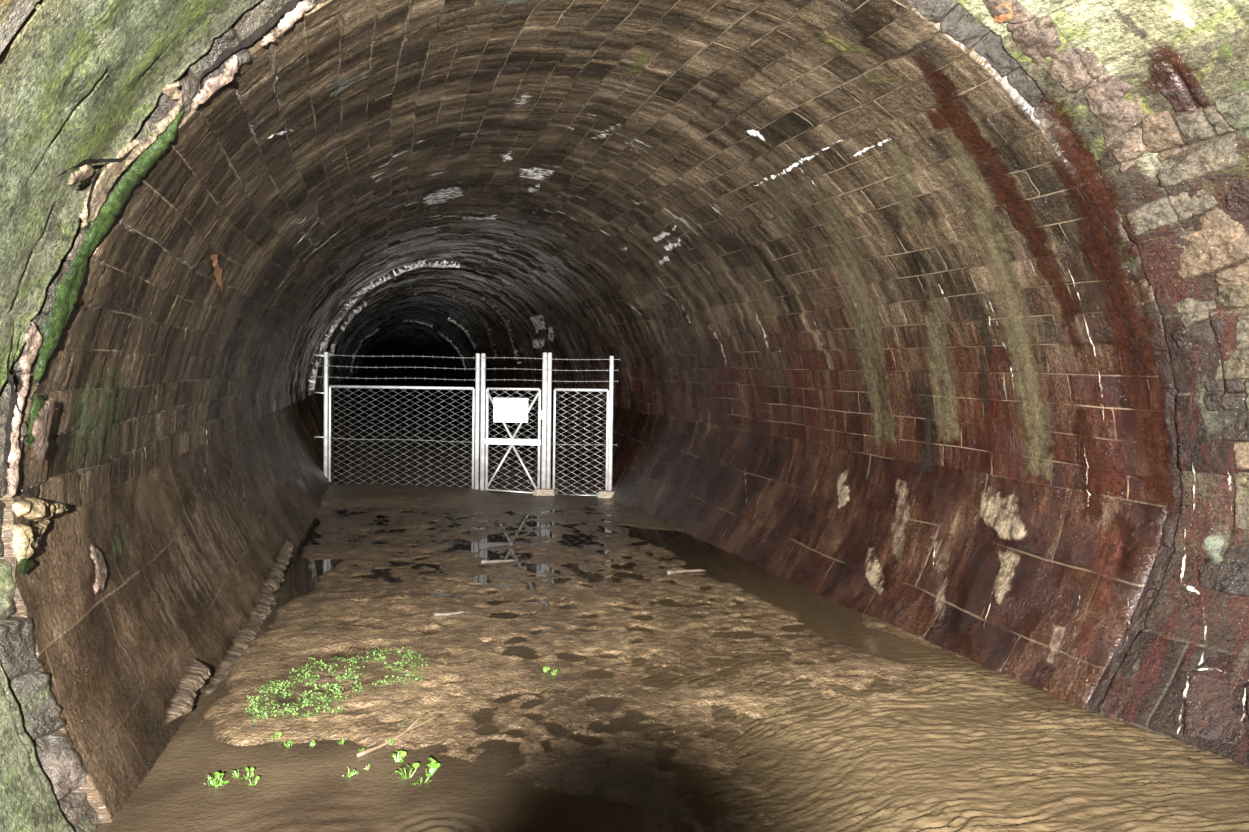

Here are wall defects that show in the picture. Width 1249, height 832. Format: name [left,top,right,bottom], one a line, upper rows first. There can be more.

crack [180,0,300,111]
spalling [261,1,313,46]
corrosion [1141,43,1207,111]
crack [56,144,138,227]
spalling [67,55,238,228]
leakage [850,139,917,231]
leakage [948,125,981,185]
leakage [920,272,958,472]
leakage [971,202,1052,477]
spalling [7,322,68,564]
spalling [864,548,882,592]
spalling [980,487,1026,604]